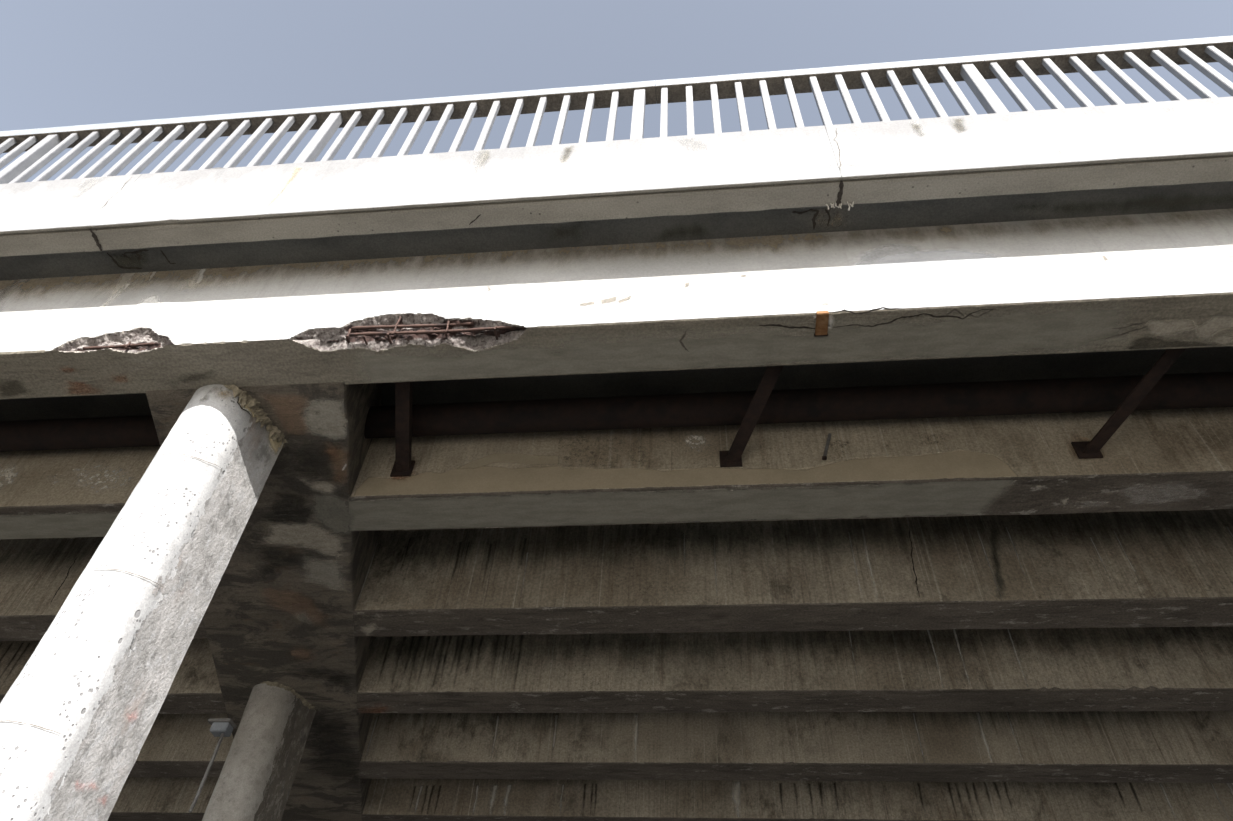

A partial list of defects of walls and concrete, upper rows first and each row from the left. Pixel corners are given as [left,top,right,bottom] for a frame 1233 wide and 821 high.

crack [834,128,844,206]
spalling [51,327,174,354]
spalling [289,313,527,352]
crack [759,307,997,329]
damp [366,511,1233,588]
damp [368,636,607,676]